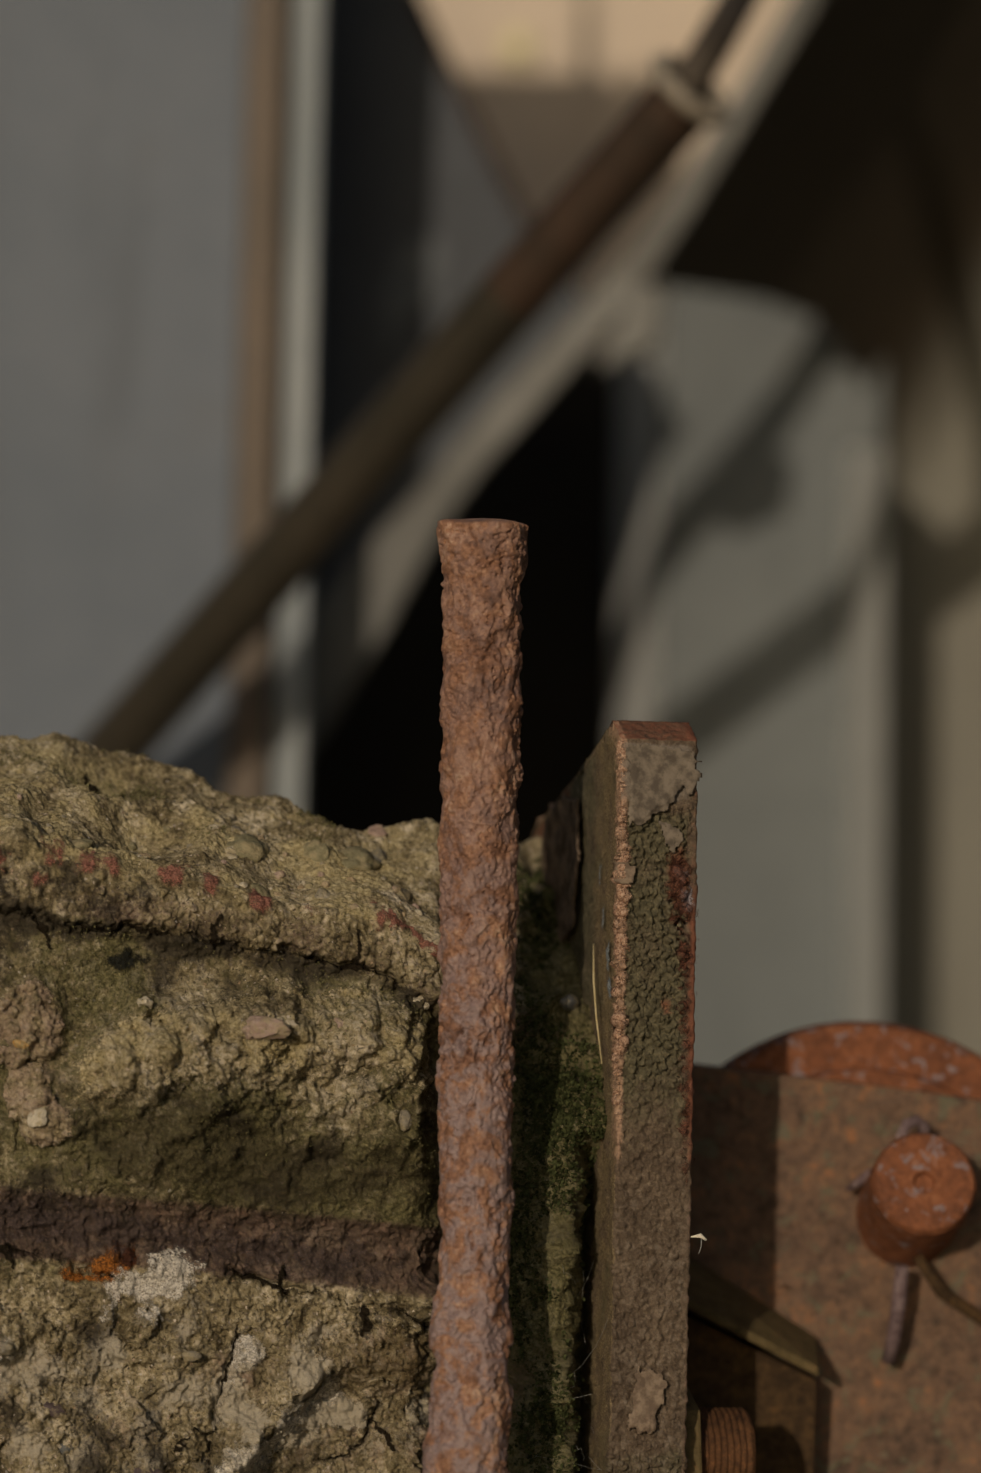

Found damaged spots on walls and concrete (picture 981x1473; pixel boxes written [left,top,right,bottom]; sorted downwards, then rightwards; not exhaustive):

crack [0,911,410,995]
rust [61,1243,138,1302]
crack [173,1327,238,1473]
crack [319,1399,396,1461]